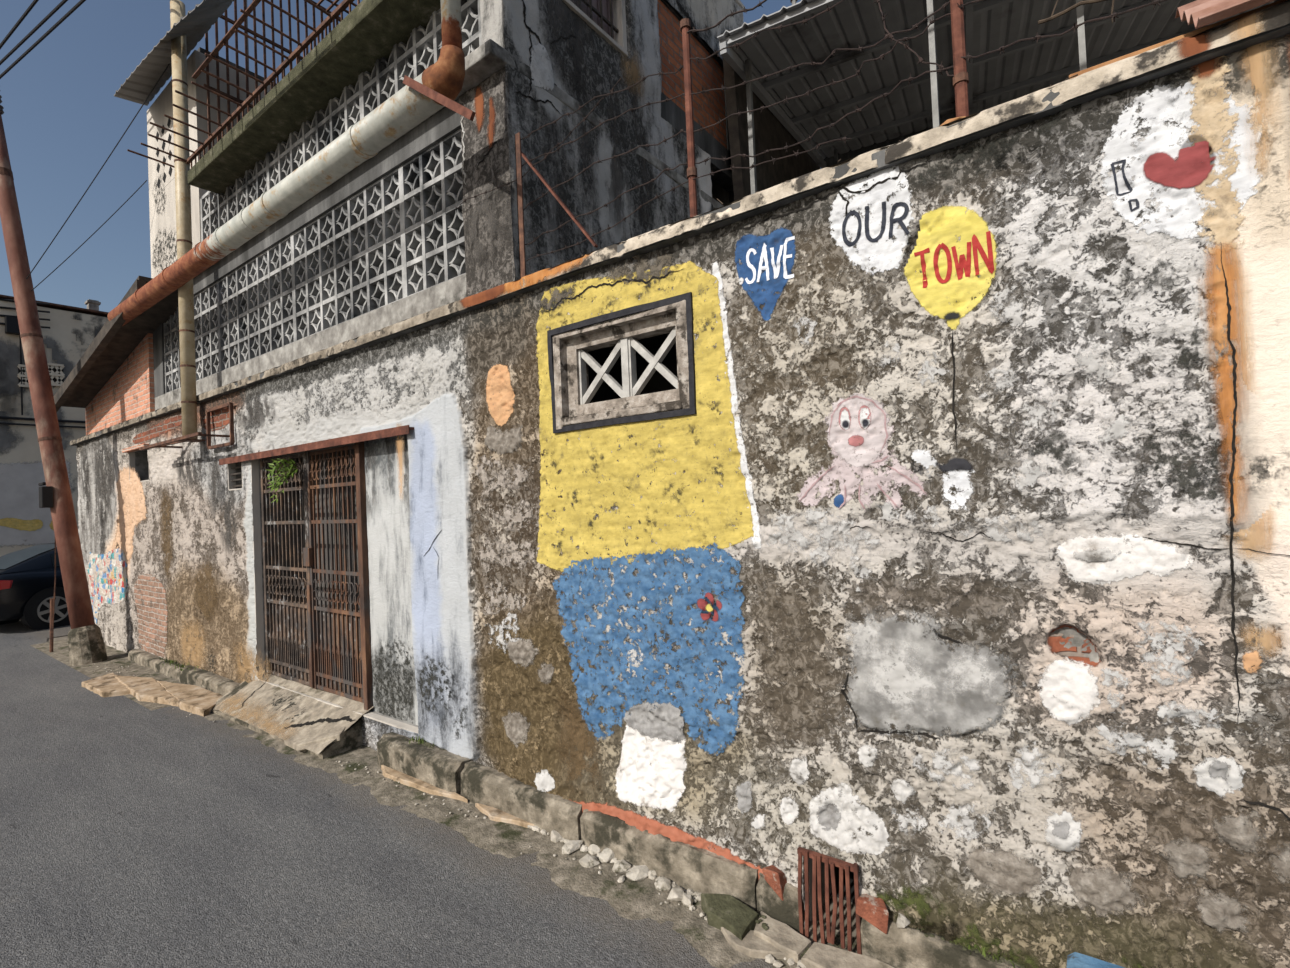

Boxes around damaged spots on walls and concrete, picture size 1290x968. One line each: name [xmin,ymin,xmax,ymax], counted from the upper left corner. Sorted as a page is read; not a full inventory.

crack [516,0,576,113]
rust [1180,13,1271,555]
flaking render [112,468,168,658]
leakage [160,492,173,578]
leakage [181,565,218,666]
leakage [176,452,235,547]
crack [1135,246,1290,719]
crack [284,716,354,729]
leakage [373,639,467,740]
spalling [735,608,1224,855]
spalling [1160,756,1290,884]
spalling [762,865,787,901]